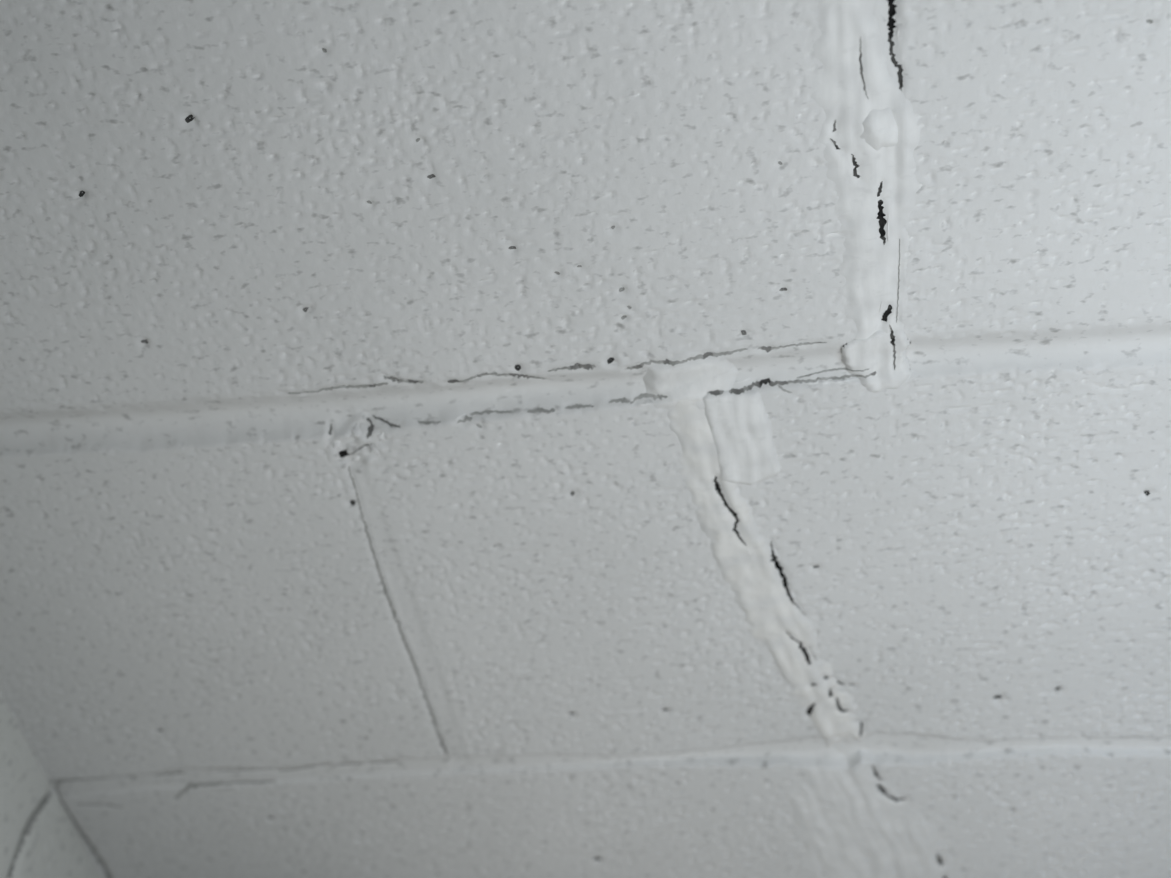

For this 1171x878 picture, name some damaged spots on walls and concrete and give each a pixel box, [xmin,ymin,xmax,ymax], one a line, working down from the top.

crack [859,0,903,100]
crack [418,120,900,428]
crack [287,363,596,394]
crack [711,474,863,736]
crack [872,765,906,802]
crack [936,853,947,878]